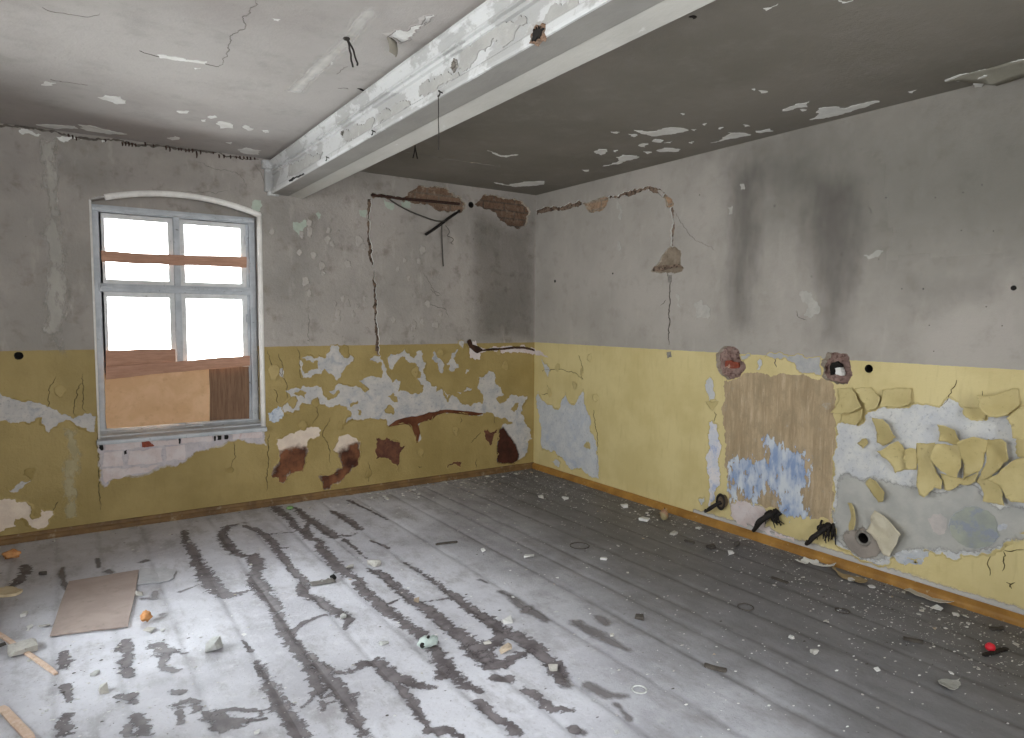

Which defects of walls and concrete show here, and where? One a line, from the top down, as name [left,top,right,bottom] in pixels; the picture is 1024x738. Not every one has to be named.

crack [205,0,258,67]
peeling [527,0,579,35]
peeling [342,32,494,142]
peeling [782,101,880,120]
peeling [594,123,772,166]
flaking render [372,181,544,229]
crack [661,273,672,358]
peeling [0,340,600,491]
peeling [698,346,1024,568]
peeling [0,480,55,534]